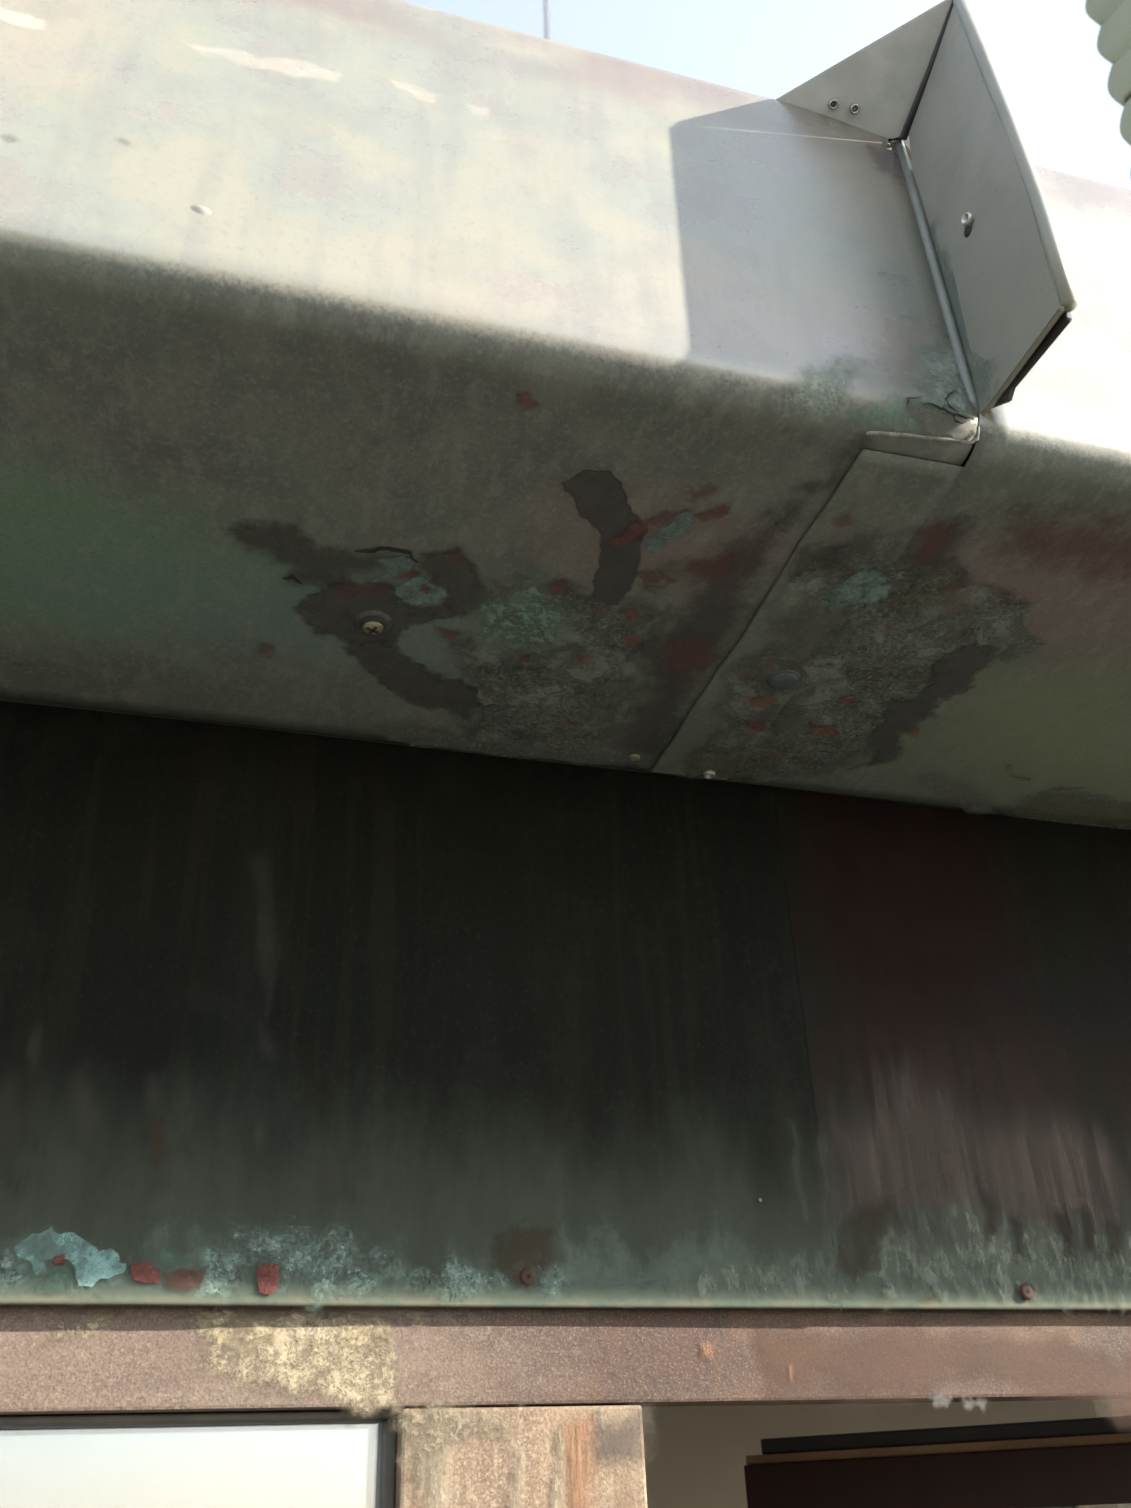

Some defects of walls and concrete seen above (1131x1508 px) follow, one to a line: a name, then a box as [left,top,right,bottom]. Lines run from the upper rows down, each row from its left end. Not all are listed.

peeling [562,470,676,606]
peeling [235,525,488,715]
leakage [647,1077,1131,1307]
peeling [16,1232,203,1292]
leakage [187,1228,574,1306]